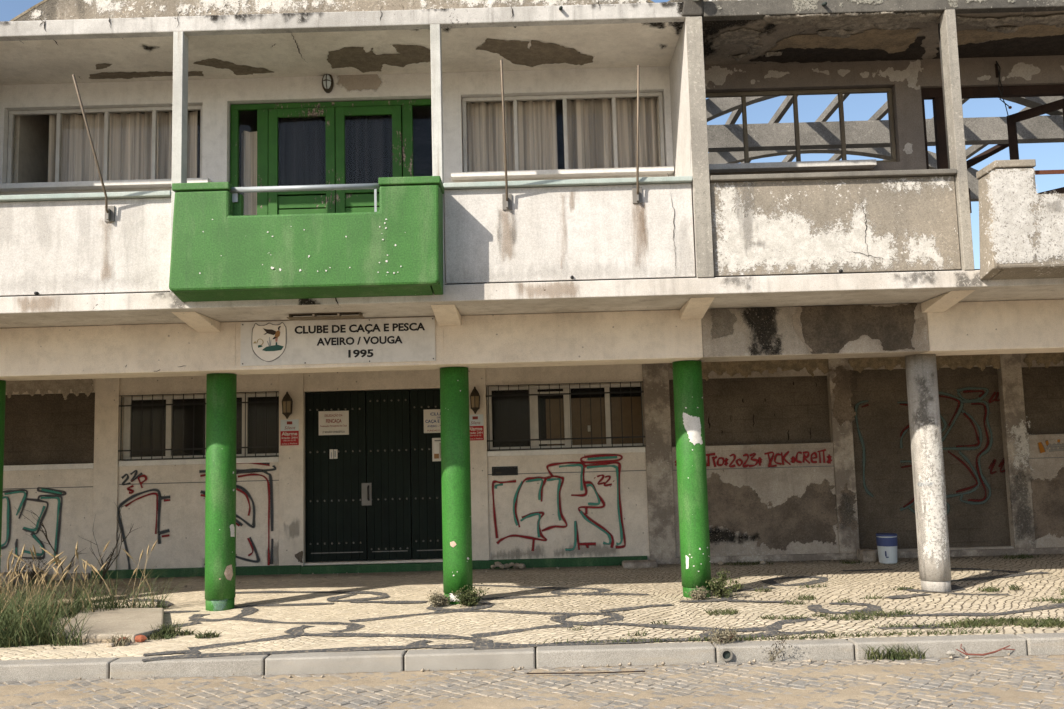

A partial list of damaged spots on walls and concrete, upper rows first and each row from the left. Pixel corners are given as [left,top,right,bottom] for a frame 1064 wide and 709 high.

leakage [235,12,321,22]
flaking render [327,45,431,91]
flaking render [476,38,595,67]
flaking render [704,11,941,90]
flaking render [956,14,1064,81]
peeling [876,176,956,198]
peeling [711,182,953,275]
peeling [984,168,1064,264]
leakage [742,307,781,355]
flaking render [792,303,927,354]
peeling [683,397,703,450]
flaking render [707,470,859,551]